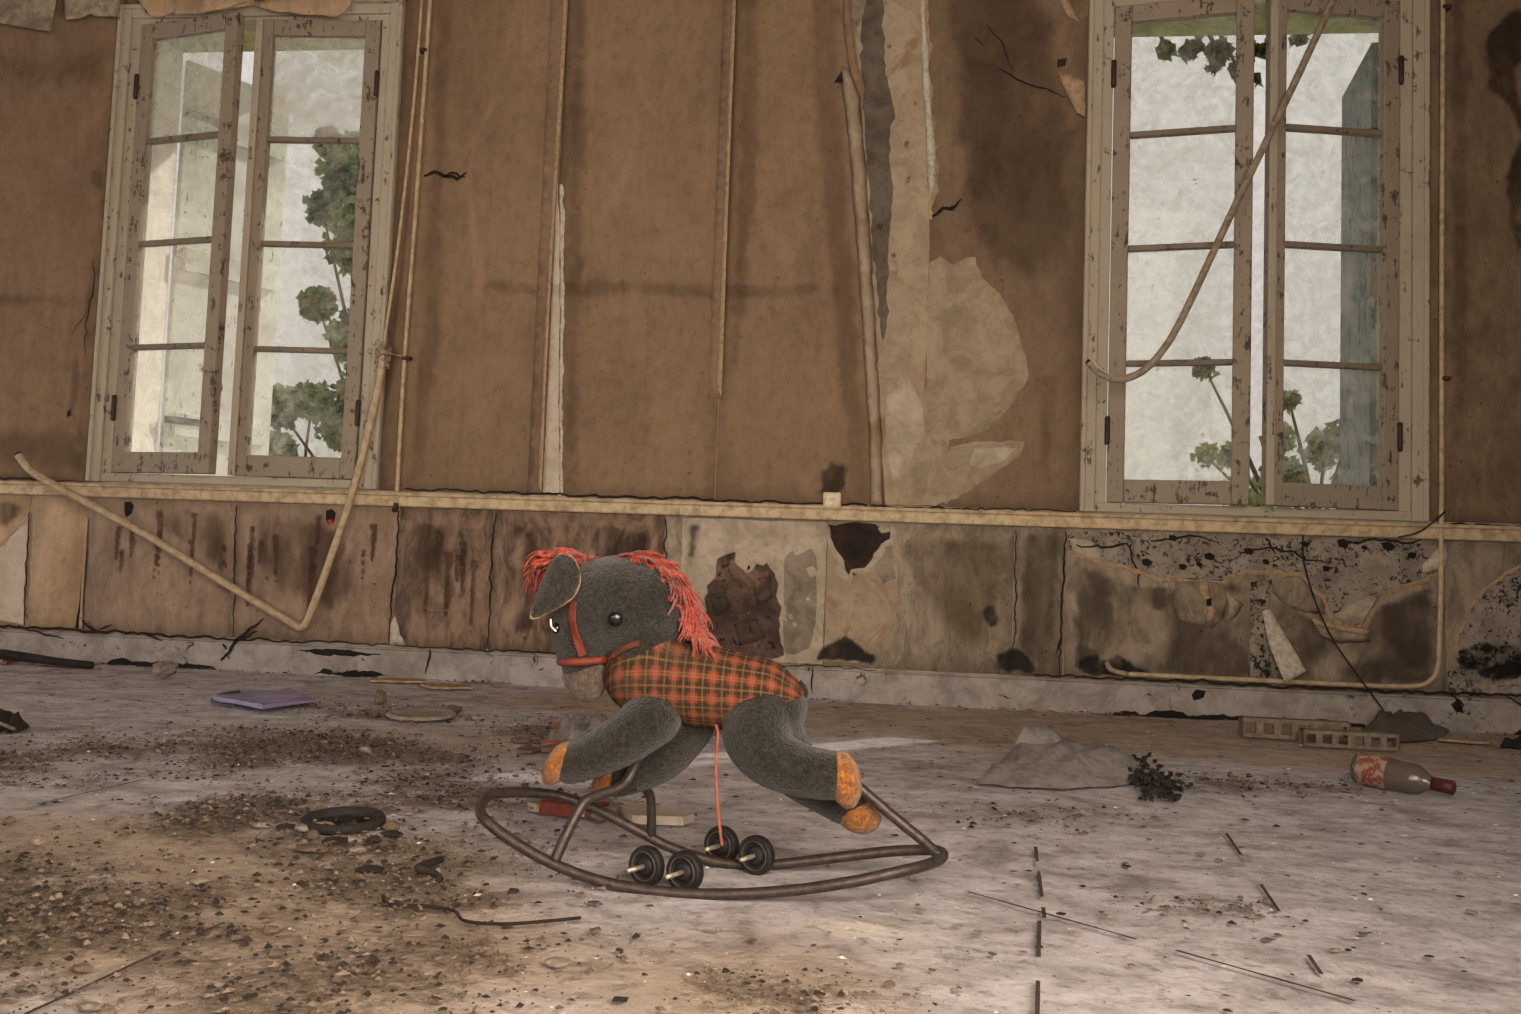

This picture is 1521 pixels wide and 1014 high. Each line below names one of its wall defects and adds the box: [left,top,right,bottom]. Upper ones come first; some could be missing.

peeling [0,0,120,31]
peeling [139,0,396,17]
leakage [1488,12,1521,127]
peeling [708,0,736,399]
flaking render [835,0,1029,506]
leakage [246,527,285,606]
leakage [302,516,341,607]
leakage [414,525,478,625]
peeling [681,518,898,664]
leakage [1076,572,1144,677]
leakage [1229,580,1283,679]
peeling [1447,564,1521,713]